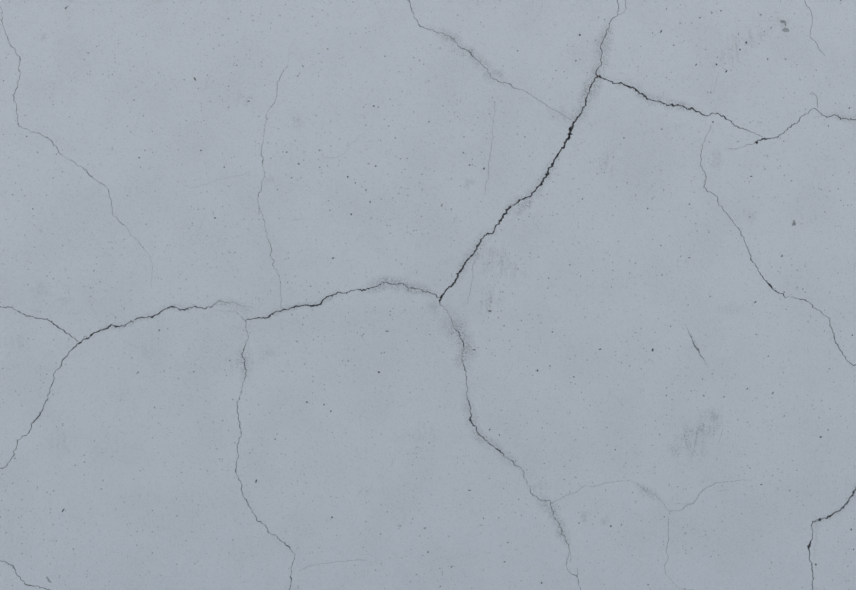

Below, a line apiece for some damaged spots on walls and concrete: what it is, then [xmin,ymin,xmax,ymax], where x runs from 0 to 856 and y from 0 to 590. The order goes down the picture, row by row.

crack [0,7,153,287]
crack [0,301,252,469]
crack [235,0,856,590]